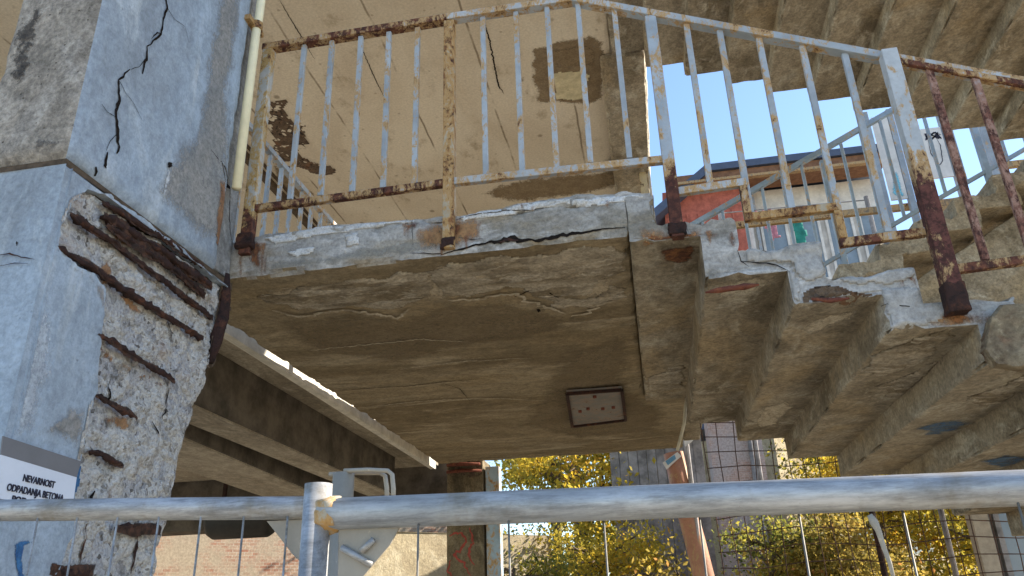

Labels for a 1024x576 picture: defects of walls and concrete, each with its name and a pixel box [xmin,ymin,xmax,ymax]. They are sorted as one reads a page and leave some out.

crack [94,0,188,176]
damp [532,36,604,104]
damp [487,159,615,201]
crack [412,208,625,255]
rust [643,231,717,263]
spalling [58,193,231,499]
peeling [746,242,956,398]
spalling [50,520,167,576]